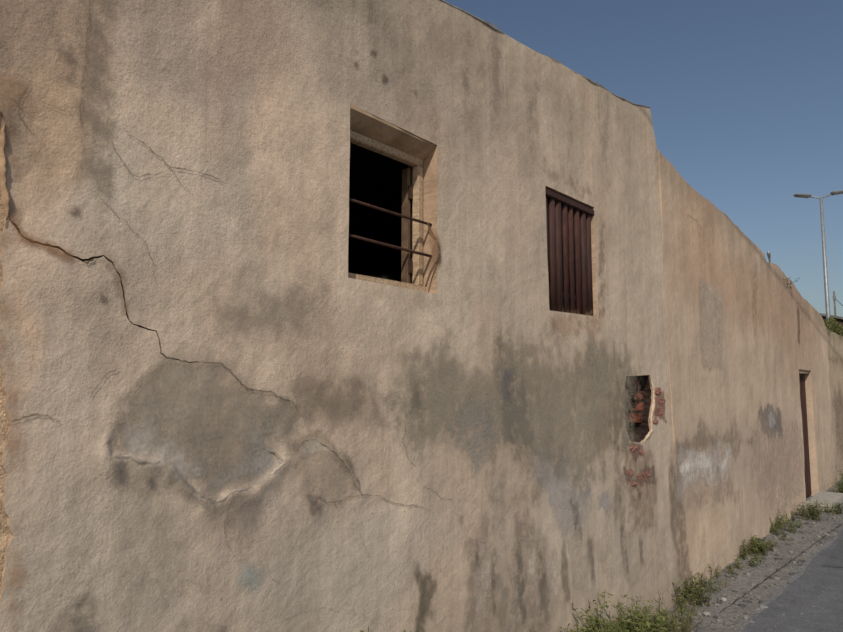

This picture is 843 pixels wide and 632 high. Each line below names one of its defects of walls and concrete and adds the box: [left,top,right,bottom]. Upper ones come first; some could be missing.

spalling [0,110,16,235]
crack [112,130,218,200]
crack [6,216,297,409]
spalling [0,369,11,592]
water stain [395,341,632,533]
hole [624,375,666,526]
water stain [416,572,434,632]
water stain [471,524,583,623]